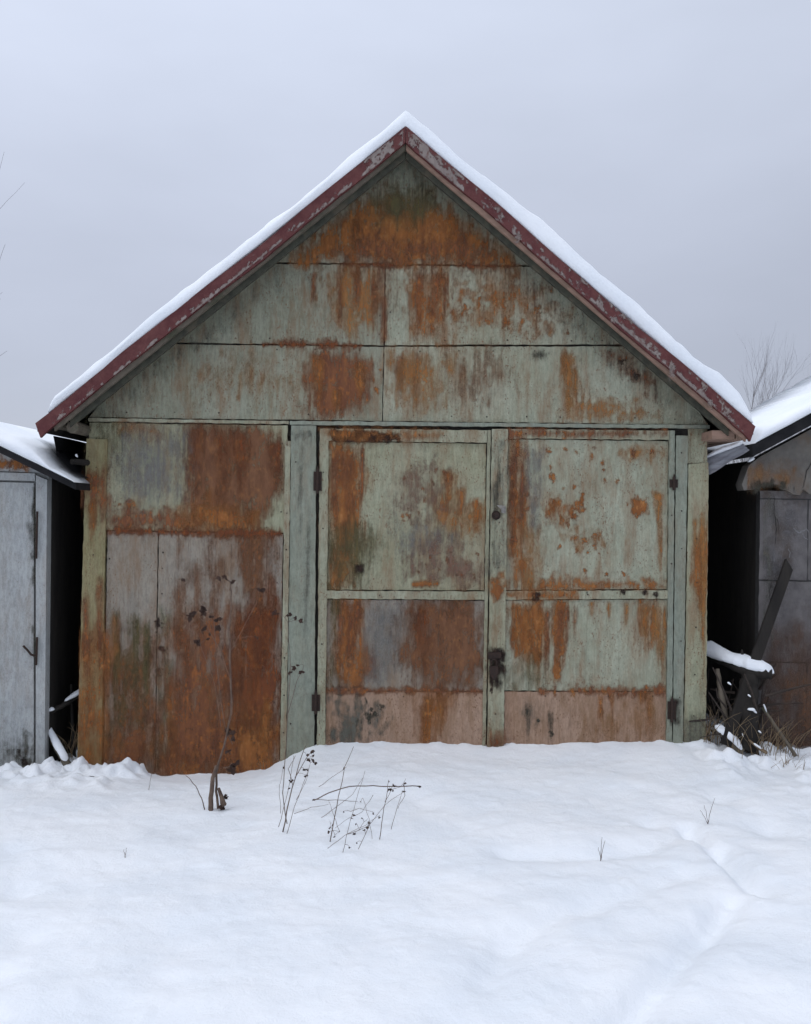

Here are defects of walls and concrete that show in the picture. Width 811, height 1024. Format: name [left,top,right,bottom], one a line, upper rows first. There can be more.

peeling [168,131,743,431]
corrosion [78,419,285,776]
corrosion [262,184,679,744]
corrosion [488,734,506,747]
corrosion [690,512,708,645]